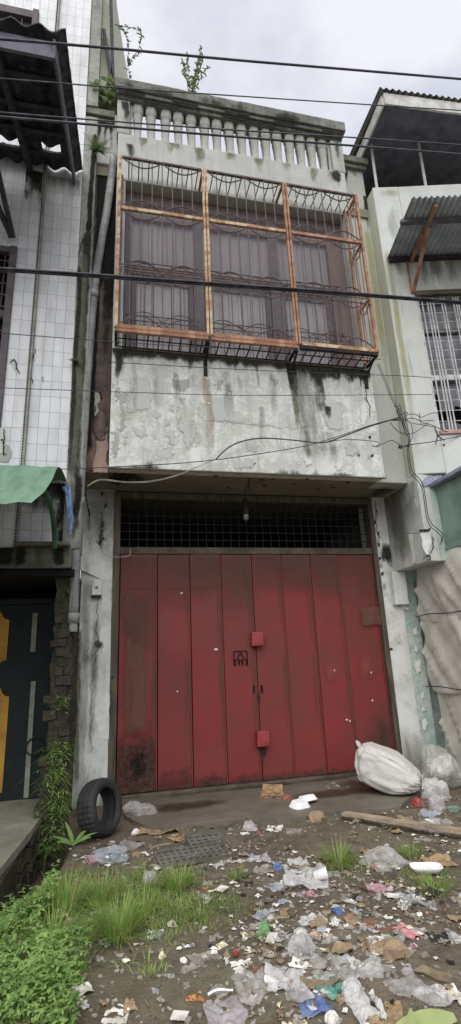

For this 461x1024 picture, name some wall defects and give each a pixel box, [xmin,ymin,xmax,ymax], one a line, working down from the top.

peeling [93,370,190,545]
leakage [0,127,371,565]